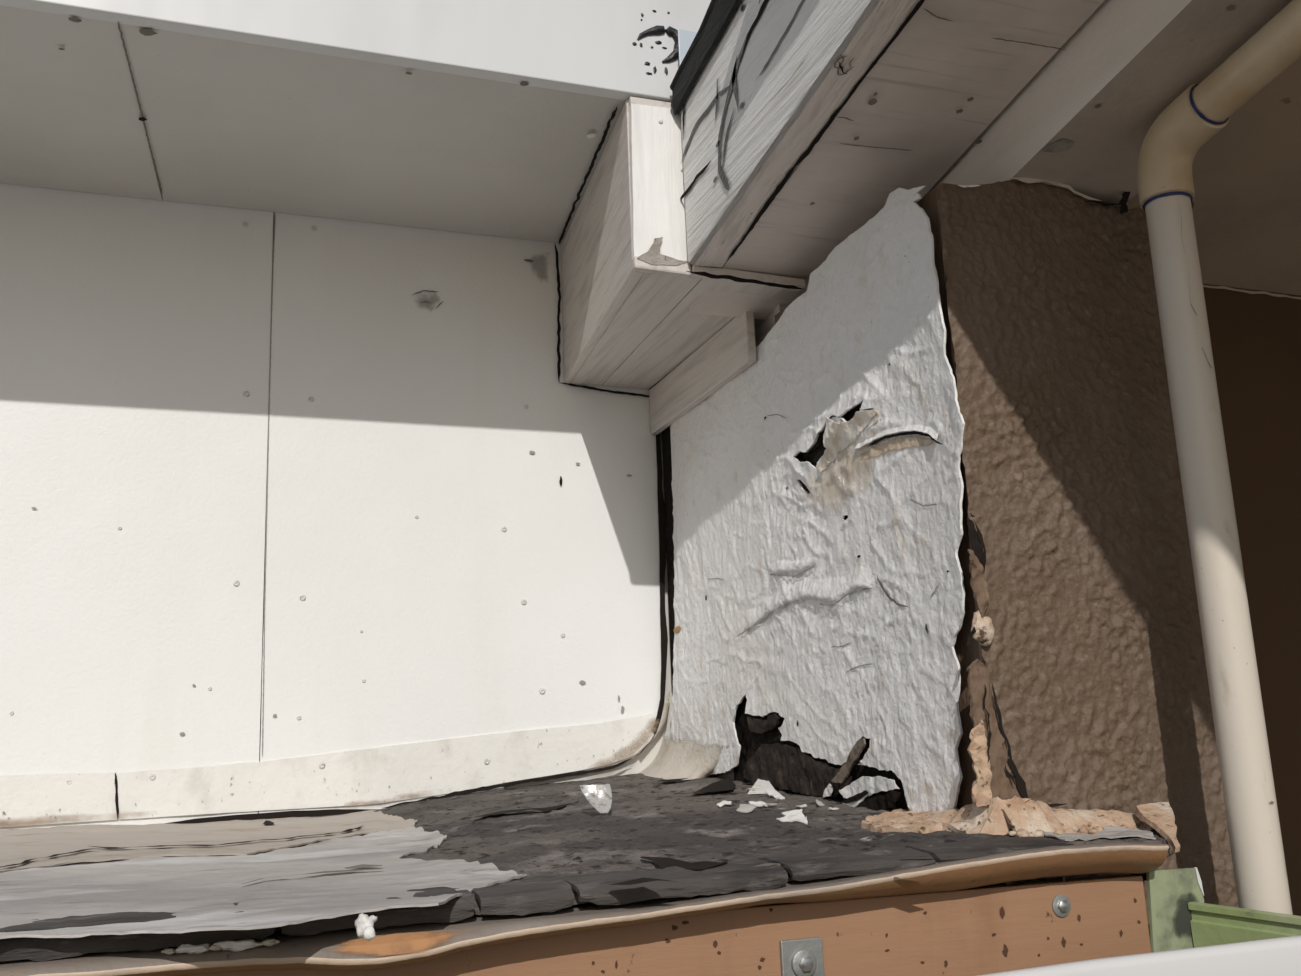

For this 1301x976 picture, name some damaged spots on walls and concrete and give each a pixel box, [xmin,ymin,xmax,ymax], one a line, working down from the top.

crack [994,38,1065,50]
crack [687,0,954,289]
crack [680,161,711,202]
spalling [799,434,826,465]
peeling [854,425,941,459]
spalling [716,549,1156,841]
peeling [0,810,527,954]